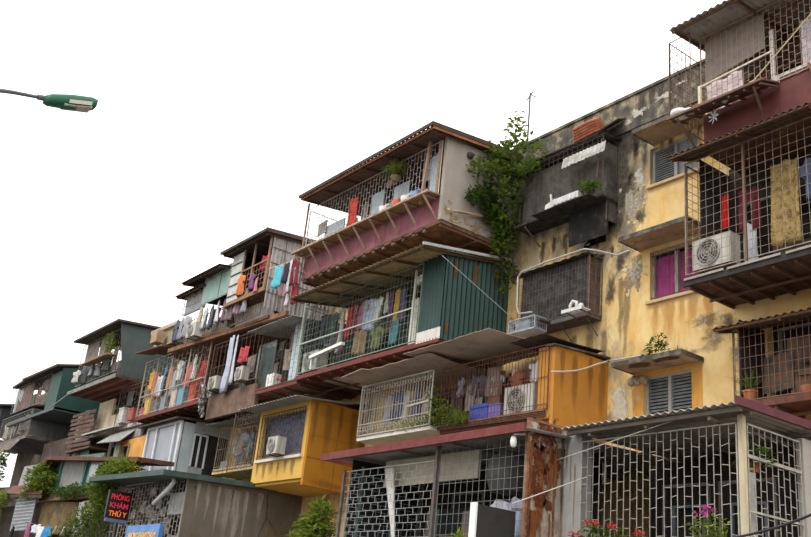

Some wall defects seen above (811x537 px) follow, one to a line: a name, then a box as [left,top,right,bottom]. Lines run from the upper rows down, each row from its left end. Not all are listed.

peeling [623,80,687,126]
damp [541,234,568,261]
damp [606,133,647,330]
peeling [618,260,648,297]
corrosion [525,415,566,537]